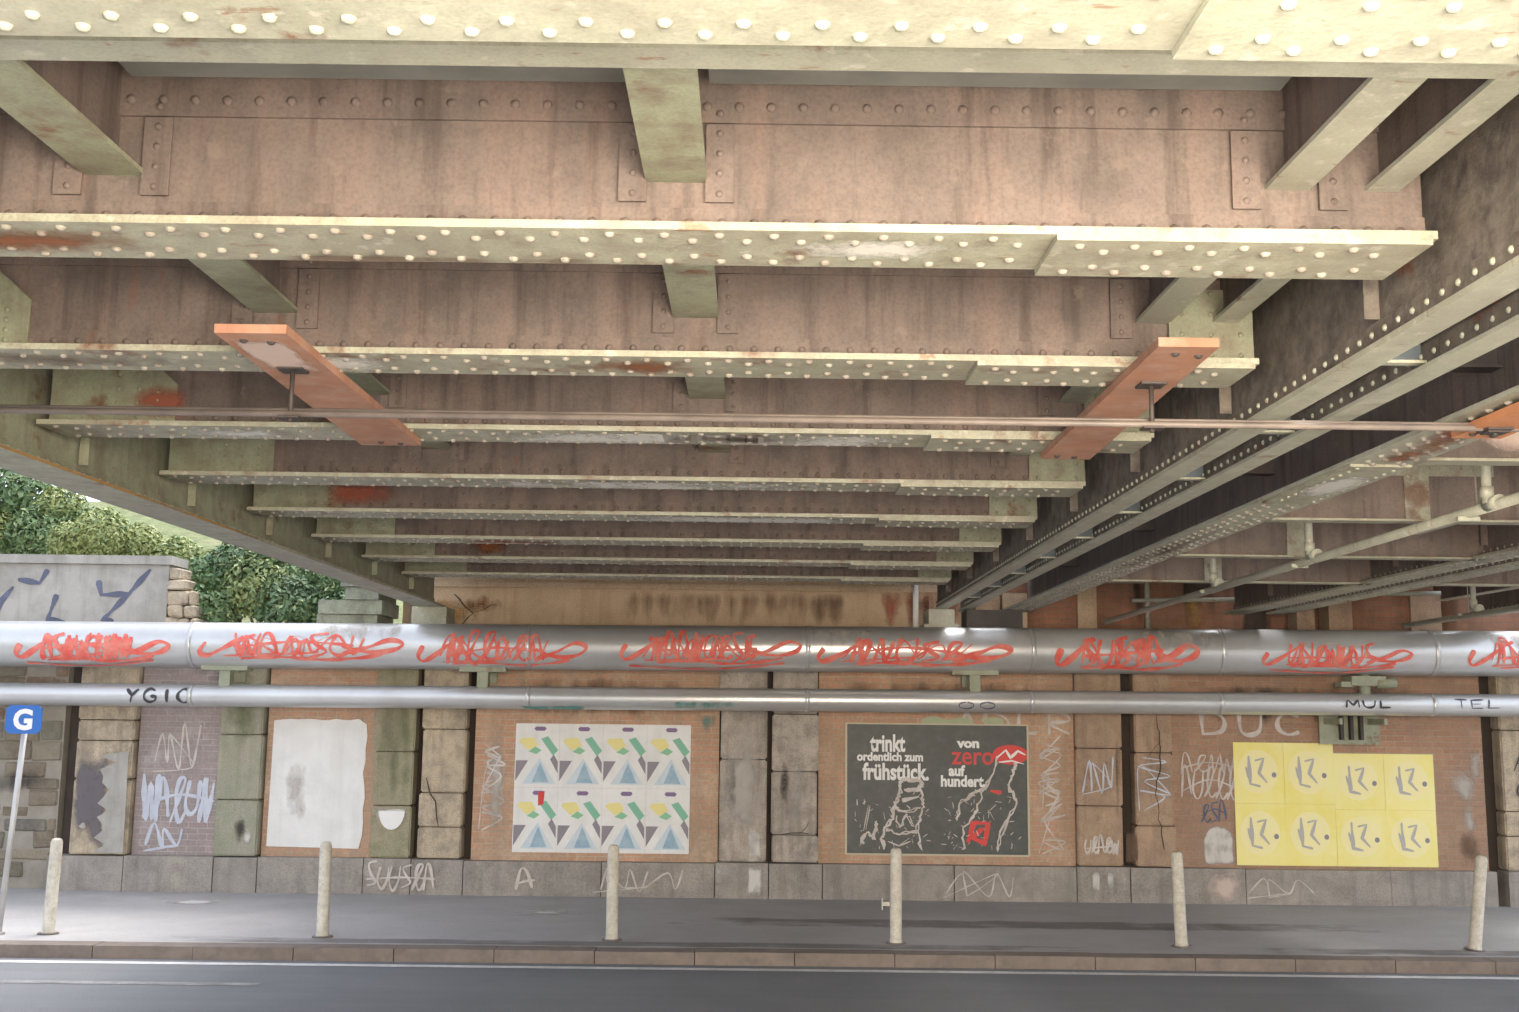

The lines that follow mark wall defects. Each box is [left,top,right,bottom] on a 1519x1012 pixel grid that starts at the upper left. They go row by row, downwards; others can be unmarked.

rust [0,235,86,249]
peeling [809,242,924,257]
rust [601,362,670,372]
rust [332,485,385,501]